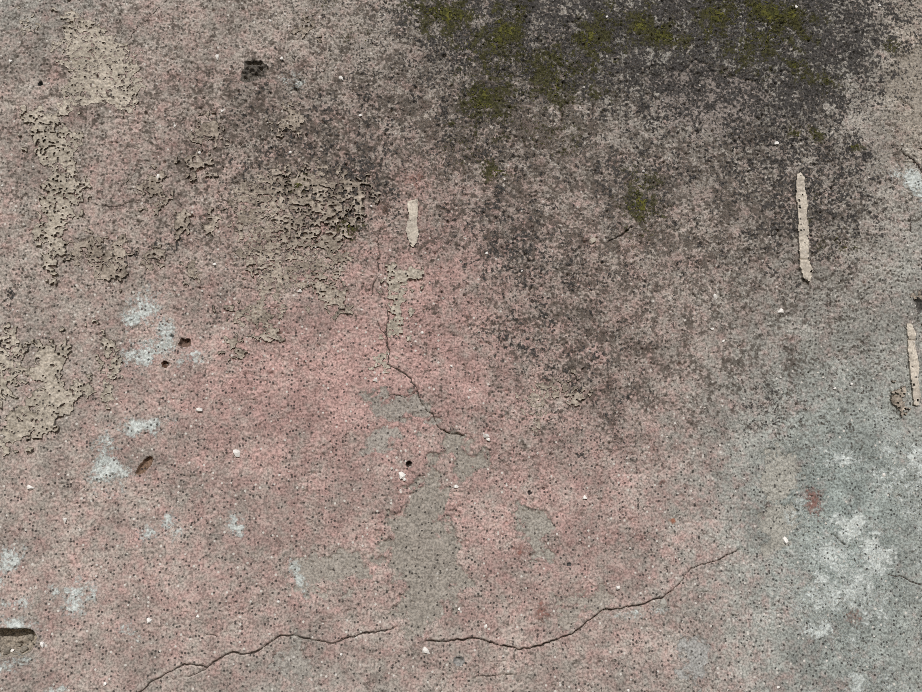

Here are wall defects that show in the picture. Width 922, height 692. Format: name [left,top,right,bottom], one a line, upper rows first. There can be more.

peeling [17,0,166,292]
peeling [174,110,230,182]
spalling [240,60,268,83]
peeling [265,100,305,138]
leakage [105,218,190,268]
peeling [126,164,193,241]
peeling [202,151,381,361]
leakage [189,0,922,464]
crack [354,206,463,436]
peeling [0,319,123,456]
crack [426,550,737,650]
crack [140,627,395,692]